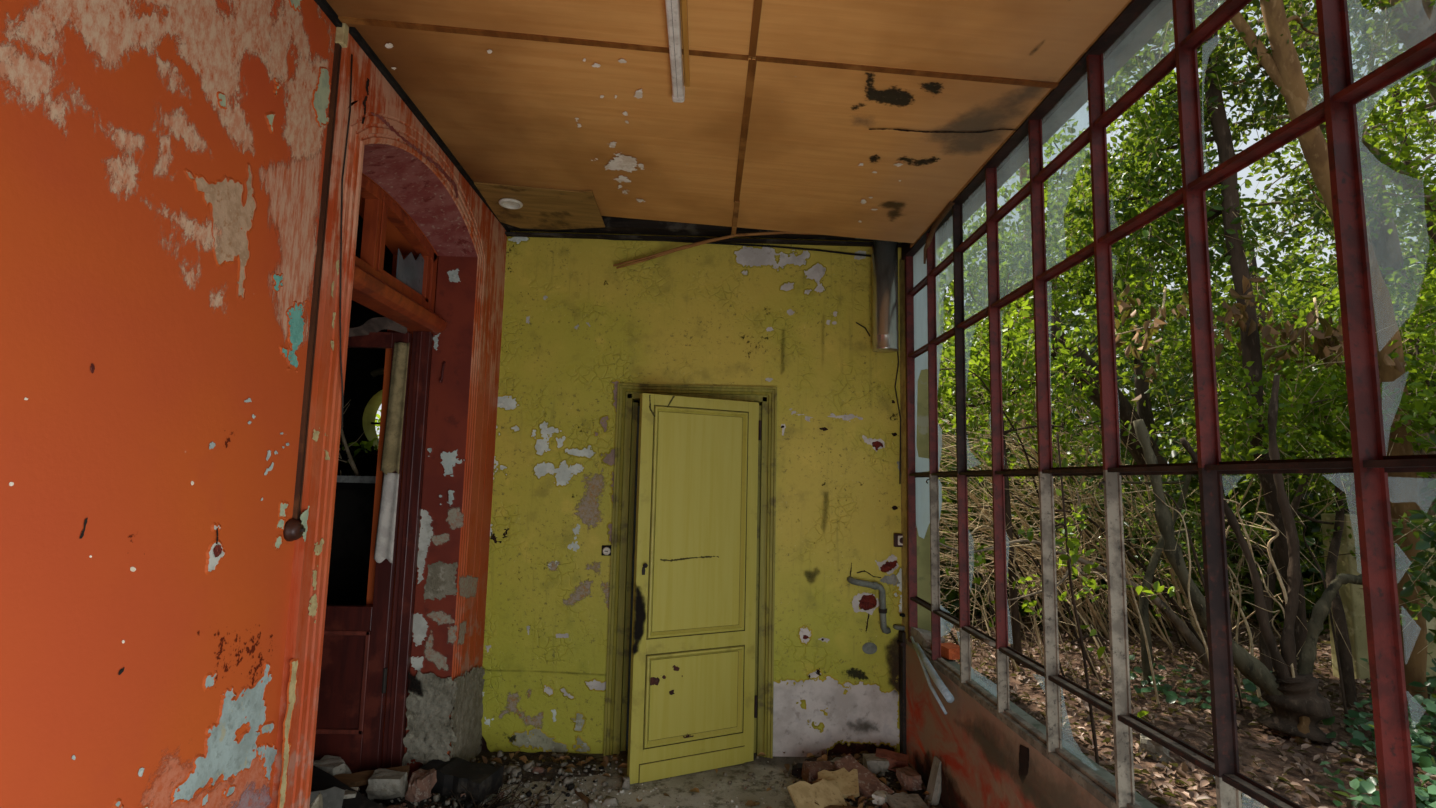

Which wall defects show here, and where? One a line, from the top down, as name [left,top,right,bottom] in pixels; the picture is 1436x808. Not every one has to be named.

leakage [851,73,944,110]
leakage [900,87,1040,166]
peeling [0,0,335,373]
peeling [330,260,339,350]
peeling [733,244,827,296]
peeling [416,447,466,585]
peeling [496,379,620,609]
peeling [459,575,478,598]
peeling [138,625,299,808]
spalling [402,610,606,766]
peeling [773,668,900,757]